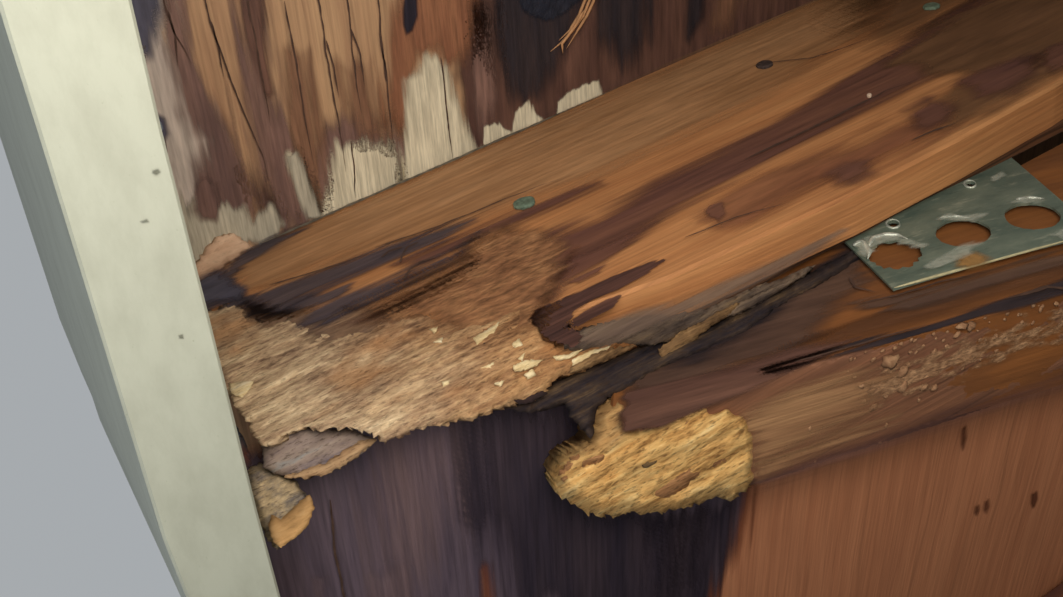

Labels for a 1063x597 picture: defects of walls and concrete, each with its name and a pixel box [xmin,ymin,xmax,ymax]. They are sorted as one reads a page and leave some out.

crack [204,0,271,188]
crack [284,1,314,164]
crack [317,0,398,198]
peeling [287,55,543,219]
crack [441,59,453,157]
peeling [557,81,602,114]
water stain [131,0,1063,341]
water stain [242,445,264,470]
peeling [473,322,499,345]
peeling [512,338,536,380]
spalling [514,391,548,405]
water stain [262,374,1031,597]